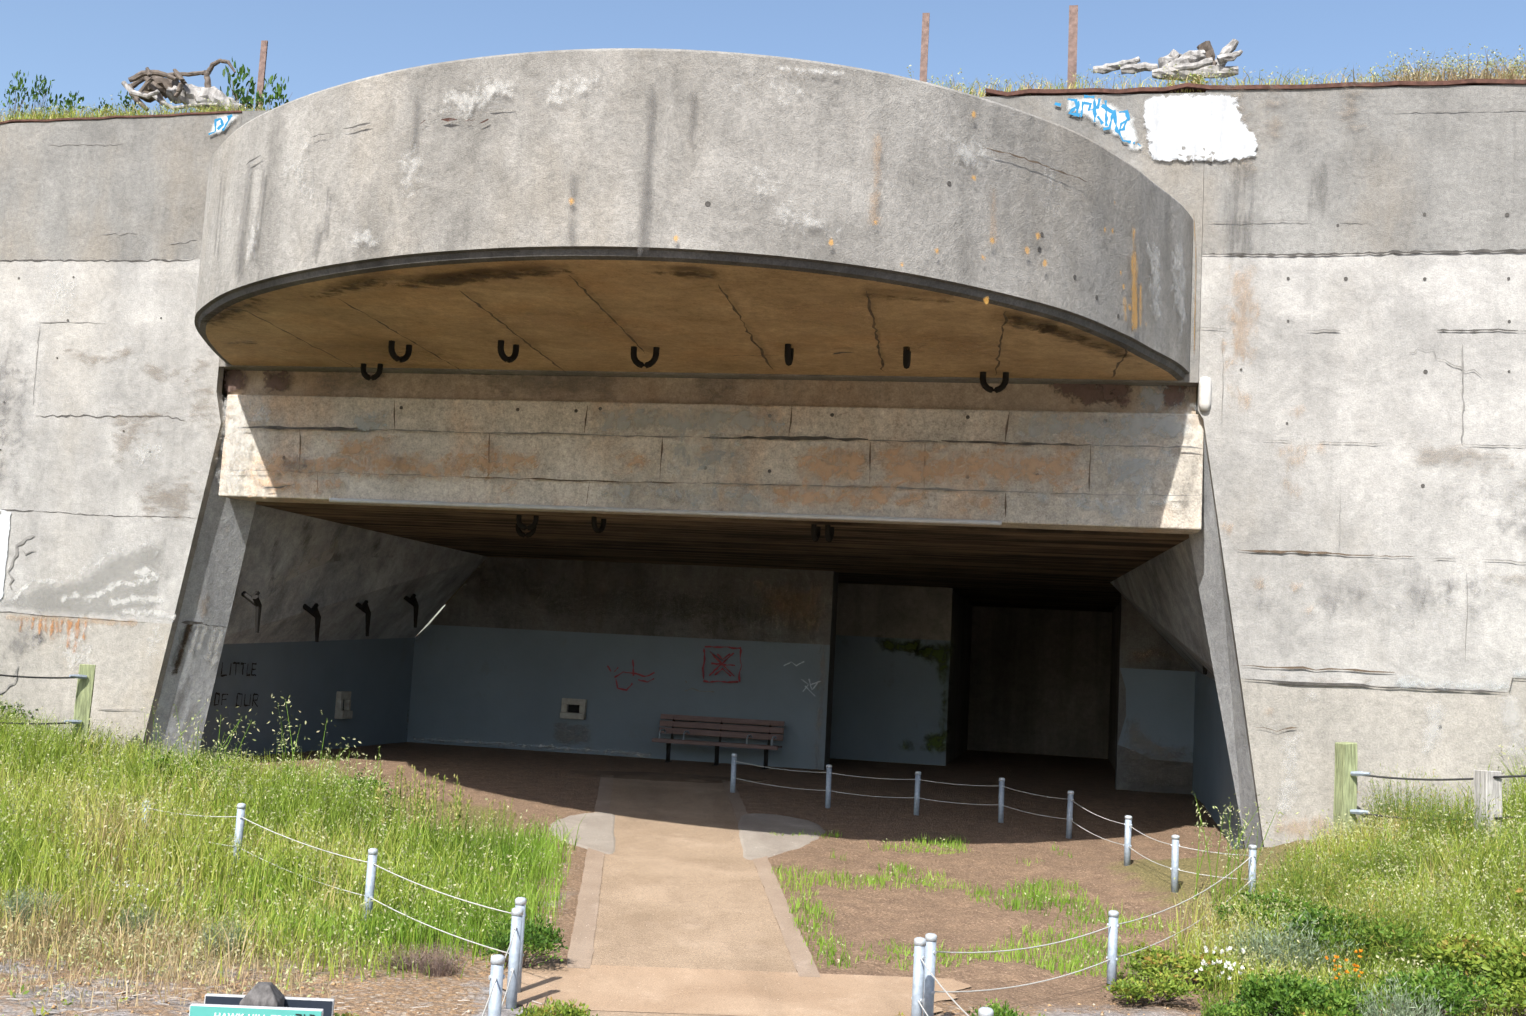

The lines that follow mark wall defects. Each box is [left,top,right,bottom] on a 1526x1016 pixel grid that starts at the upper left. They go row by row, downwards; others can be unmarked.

corrosion [251,436,466,492]
damp [62,567,222,674]